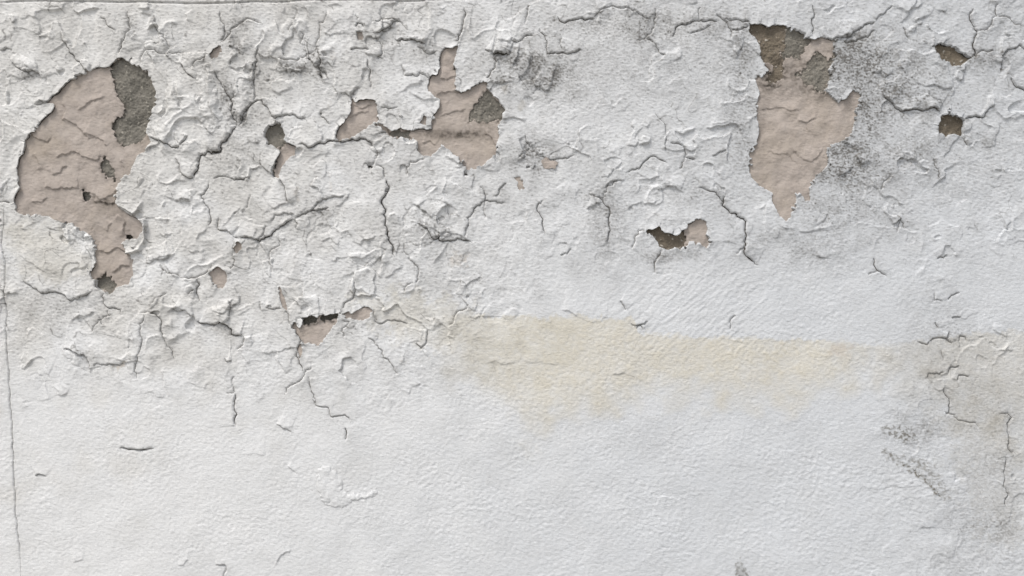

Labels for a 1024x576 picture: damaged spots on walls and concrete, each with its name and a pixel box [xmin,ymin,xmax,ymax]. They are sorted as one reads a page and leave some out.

crack [485,5,749,76]
crack [969,8,1024,90]
peeling [9,52,157,294]
crack [41,12,433,440]
peeling [265,124,296,178]
peeling [336,41,505,170]
crack [417,174,500,242]
peeling [644,219,711,250]
crack [700,187,757,265]
peeling [748,18,860,221]
spalling [934,110,964,137]
leakage [343,277,1024,576]